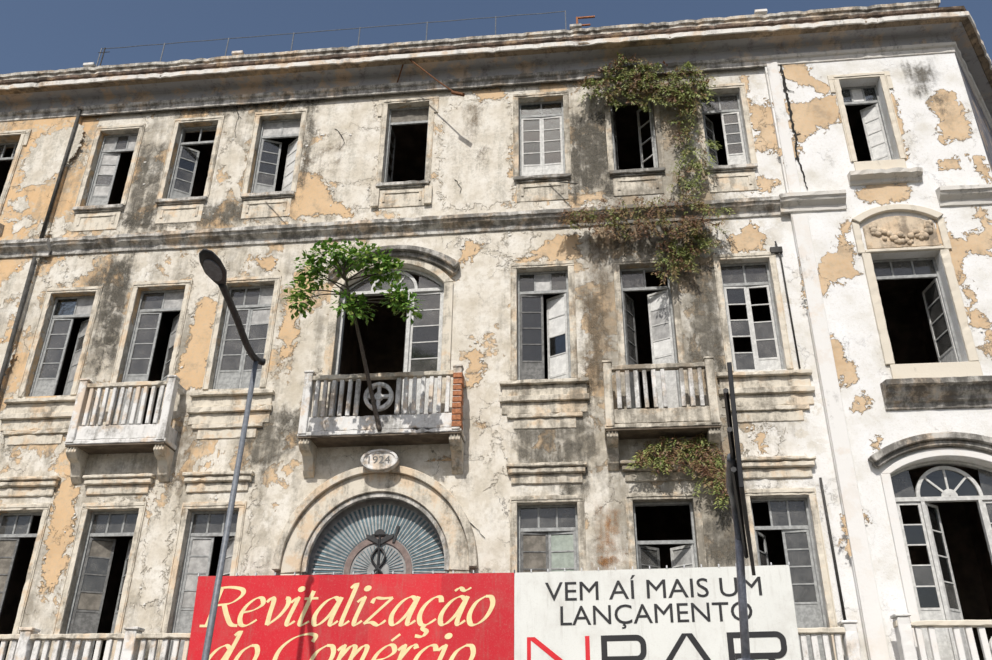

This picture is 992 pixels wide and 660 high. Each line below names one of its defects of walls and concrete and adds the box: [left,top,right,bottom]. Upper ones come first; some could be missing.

peeling [276,95,381,220]
flaking render [739,63,842,164]
damp [908,64,933,94]
flaking render [925,89,973,145]
flaking render [936,153,992,184]
flaking render [174,254,220,392]
flaking render [458,238,485,268]
flaking render [496,231,583,267]
flaking render [817,217,864,298]
flaking render [932,206,992,360]
flaking render [37,475,84,592]